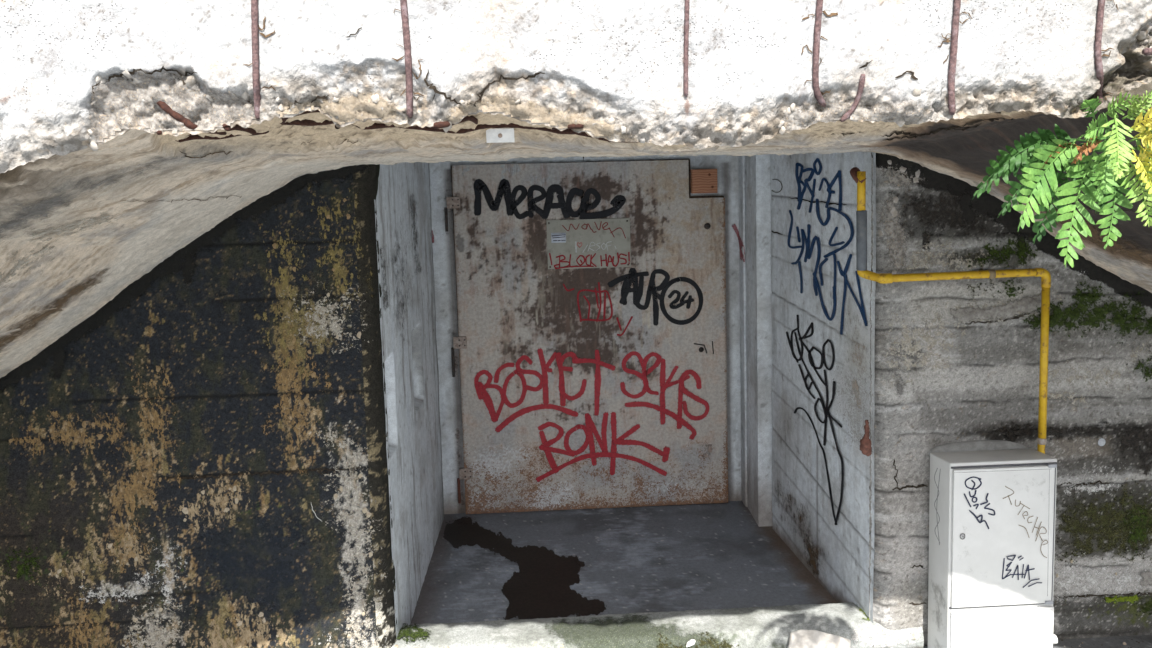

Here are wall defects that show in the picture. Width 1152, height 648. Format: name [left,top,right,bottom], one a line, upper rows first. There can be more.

spalling [86,0,645,151]
spalling [778,0,930,135]
spalling [948,0,961,115]
spalling [1094,0,1105,104]
leakage [0,164,370,393]
leakage [380,198,421,345]
leakage [872,153,1152,308]
leakage [836,290,1065,452]
leakage [79,426,417,648]
leakage [443,517,722,648]
crack [892,459,928,490]
leakage [993,422,1152,494]